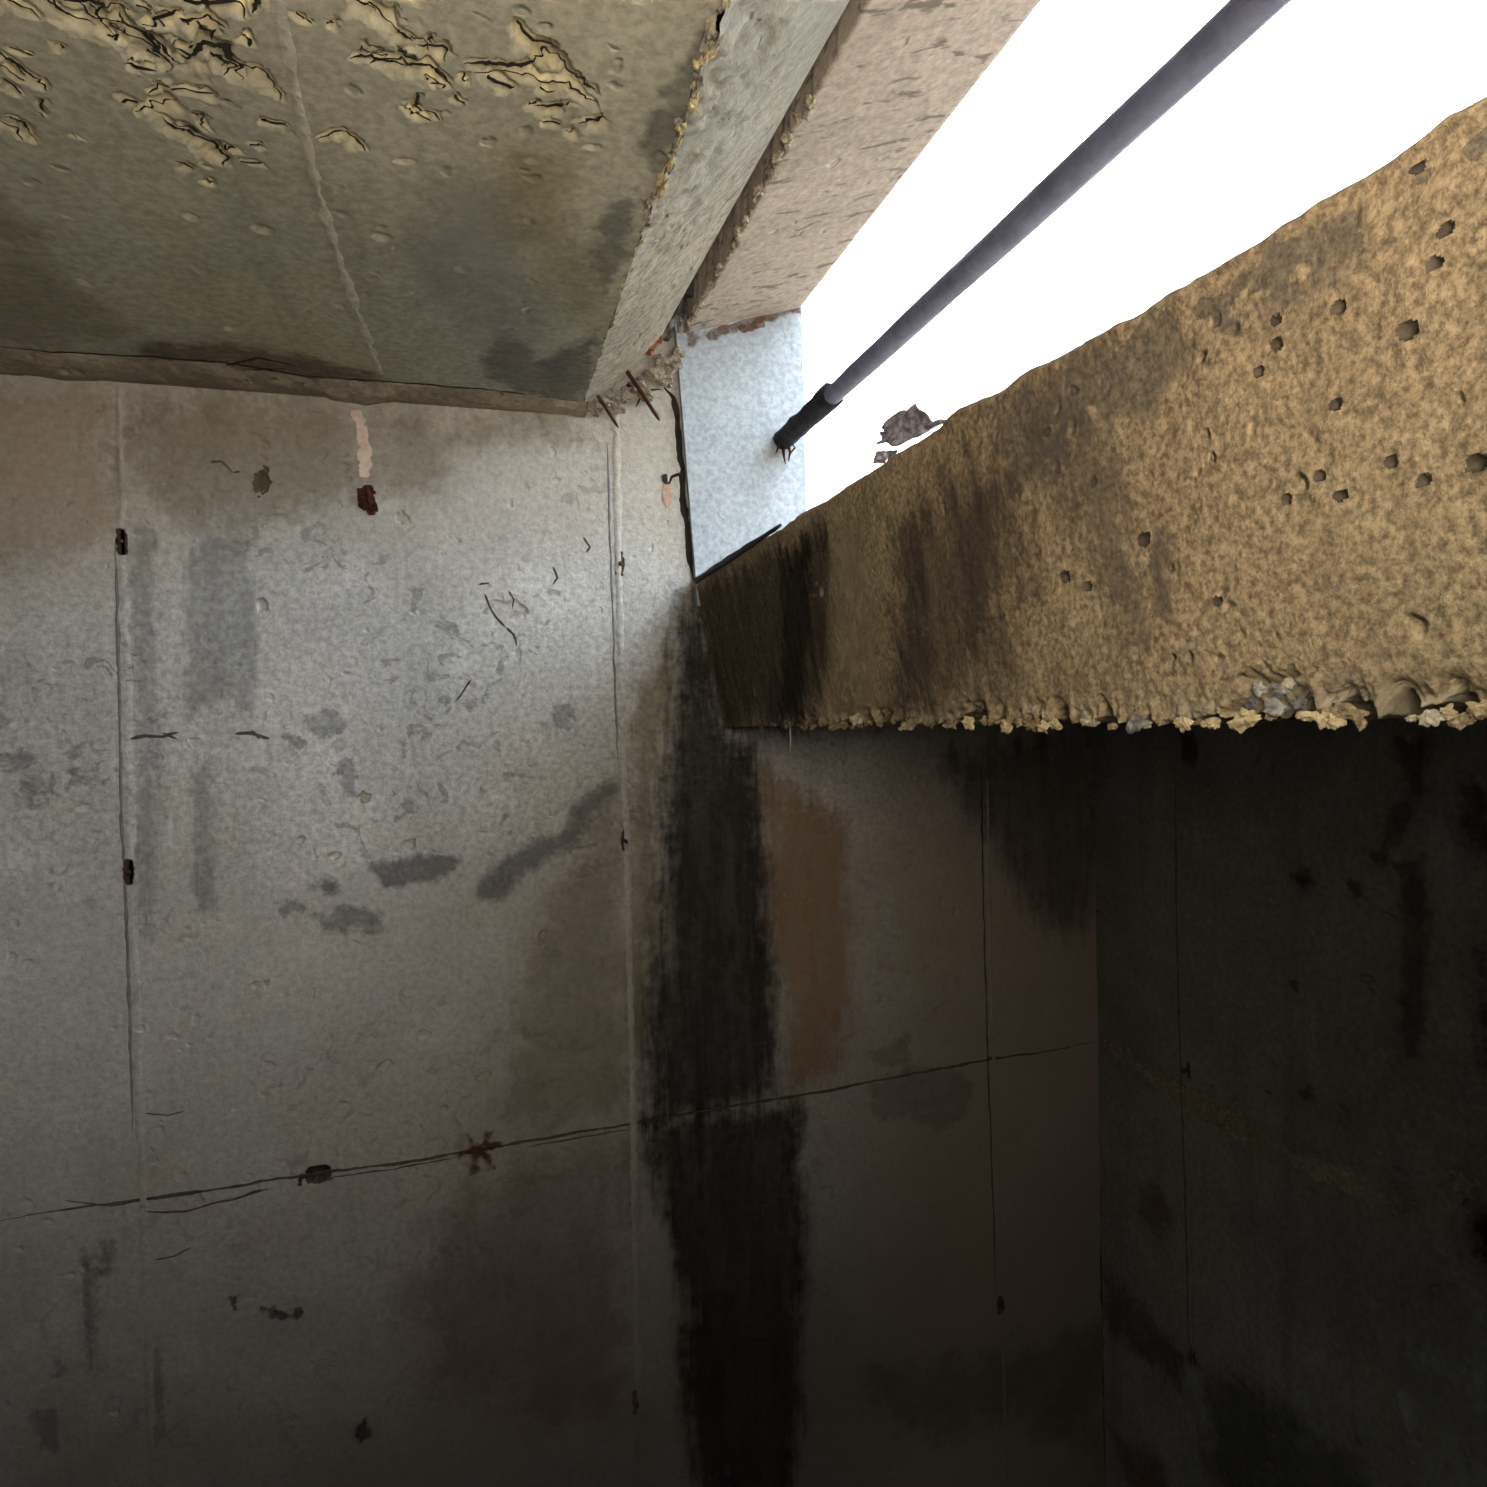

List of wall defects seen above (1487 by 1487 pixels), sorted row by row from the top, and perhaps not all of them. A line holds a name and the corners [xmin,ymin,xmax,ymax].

spalling [0,0,617,188]
spalling [583,0,733,394]
rust [646,332,664,357]
rust [357,485,378,515]
spalling [759,712,1153,734]
spalling [1405,700,1487,730]
damp [478,784,616,899]
damp [370,854,457,887]
damp [640,522,874,1487]
rust [459,1132,501,1174]
crack [0,1041,1097,1260]